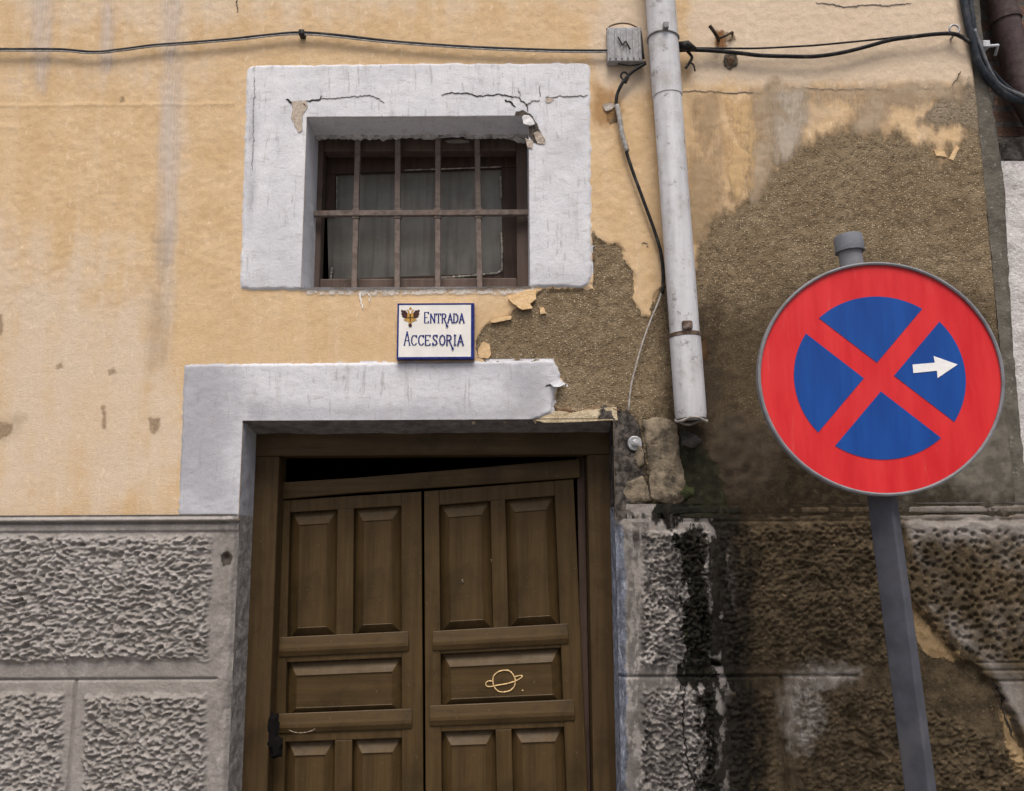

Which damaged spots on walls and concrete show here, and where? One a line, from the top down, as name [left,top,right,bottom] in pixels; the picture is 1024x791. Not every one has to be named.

crack [816,1,910,9]
flaking render [286,96,321,132]
crack [441,87,586,111]
flaking render [476,81,1000,517]
damp [897,486,1016,517]
spalling [220,551,232,566]
damp [651,422,870,791]